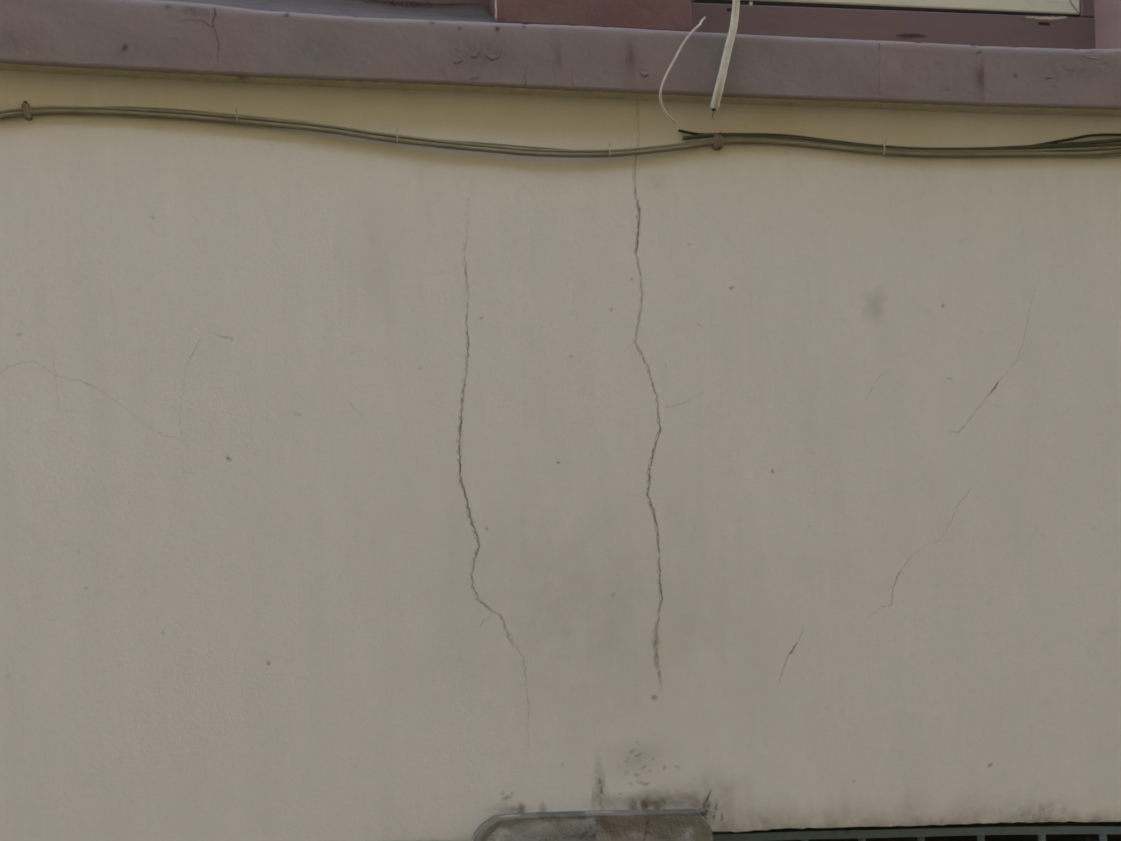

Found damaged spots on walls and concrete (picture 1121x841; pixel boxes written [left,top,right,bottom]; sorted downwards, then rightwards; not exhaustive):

crack [459,329,504,622]